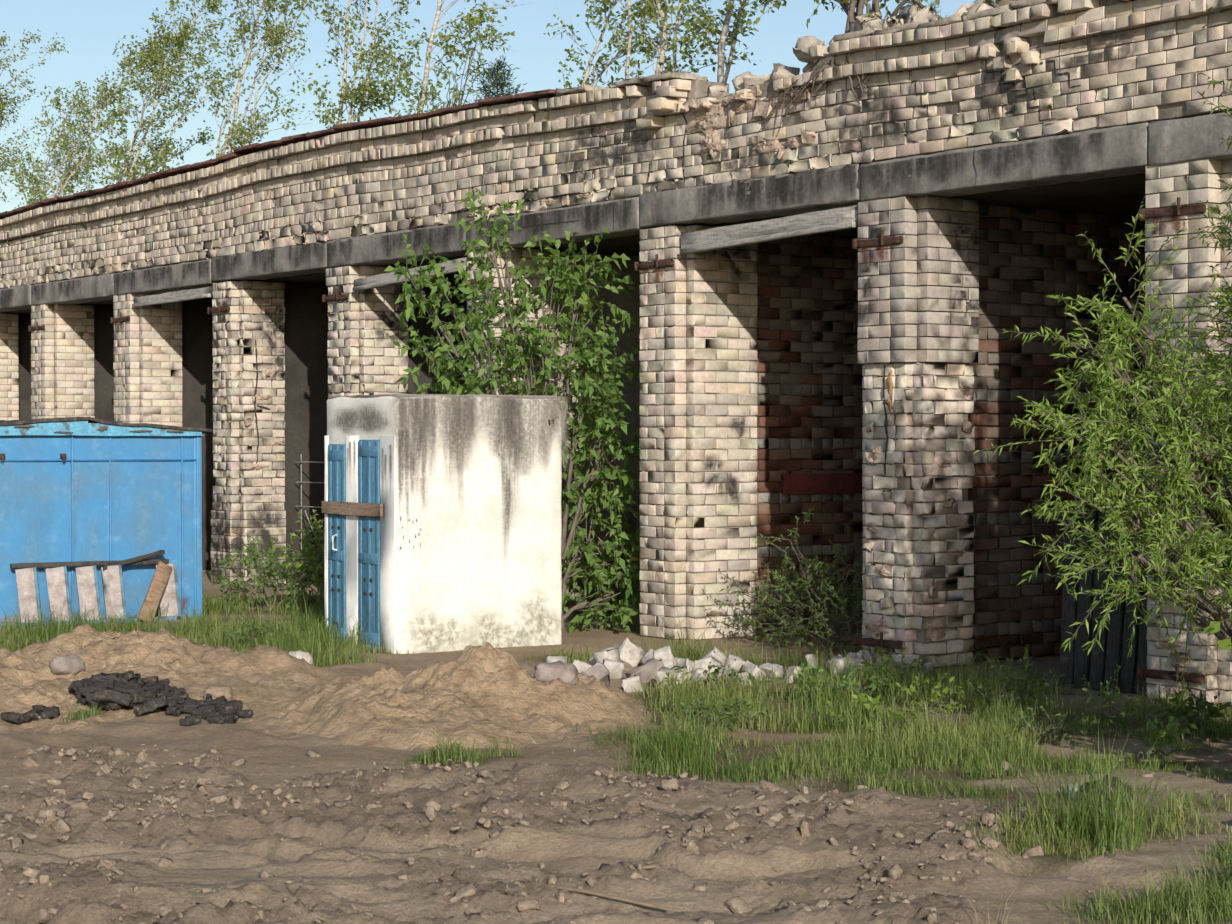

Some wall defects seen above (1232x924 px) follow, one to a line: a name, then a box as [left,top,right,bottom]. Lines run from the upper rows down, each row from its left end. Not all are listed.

spalling [682,84,816,159]
water stain [703,90,964,208]
water stain [979,142,1035,174]
water stain [1055,132,1102,164]
water stain [336,395,565,513]
water stain [502,472,510,528]